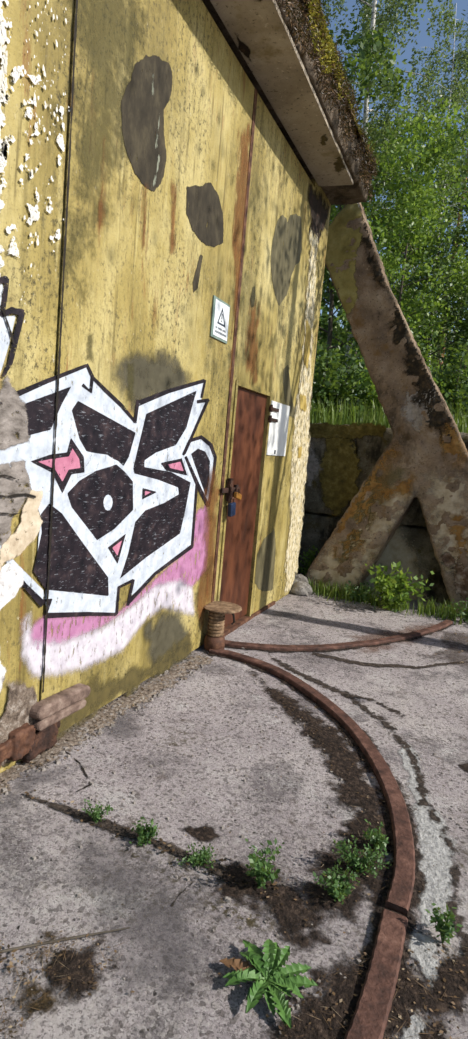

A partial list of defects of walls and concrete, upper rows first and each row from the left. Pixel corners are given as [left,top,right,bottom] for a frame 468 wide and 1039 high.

peeling [0,0,71,277]
rust [229,126,259,384]
spalling [0,375,29,450]
spalling [0,460,43,610]
spalling [0,653,214,795]